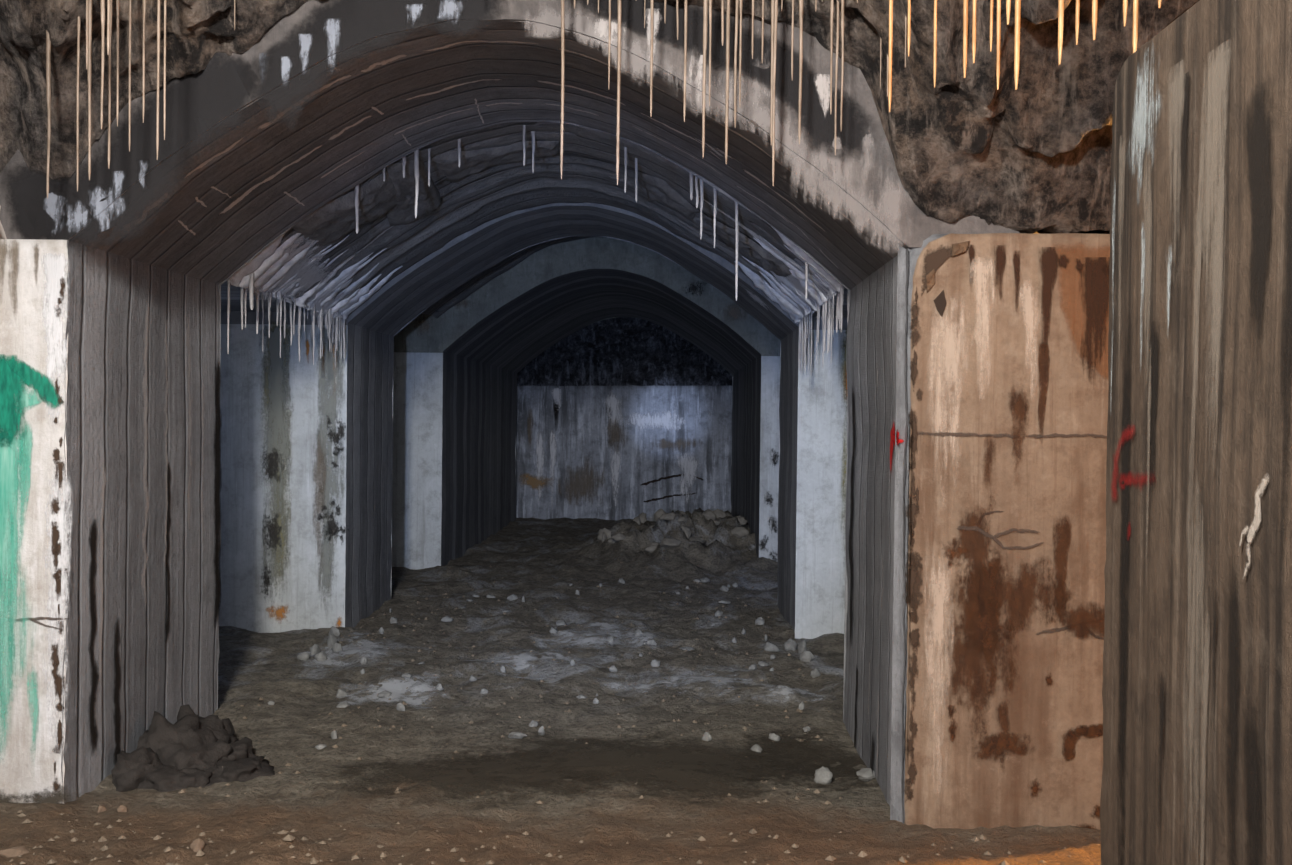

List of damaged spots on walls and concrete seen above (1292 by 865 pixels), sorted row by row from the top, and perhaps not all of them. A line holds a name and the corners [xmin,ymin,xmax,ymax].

leakage [0,244,18,309]
corrosion [944,513,1105,761]